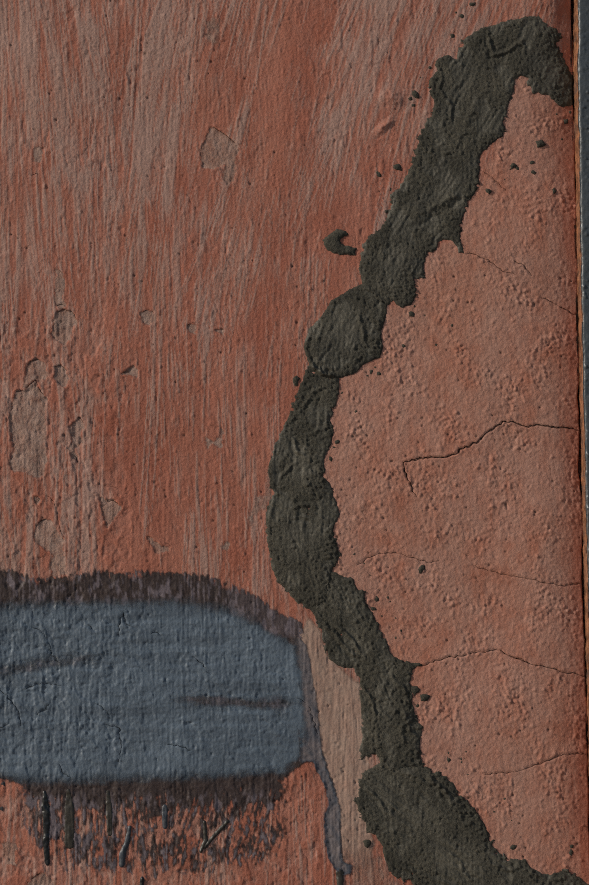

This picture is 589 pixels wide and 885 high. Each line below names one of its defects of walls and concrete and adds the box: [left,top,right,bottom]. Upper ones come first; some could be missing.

crack [567,6,575,67]
crack [552,296,579,373]
peeling [9,358,69,477]
crack [403,421,574,494]